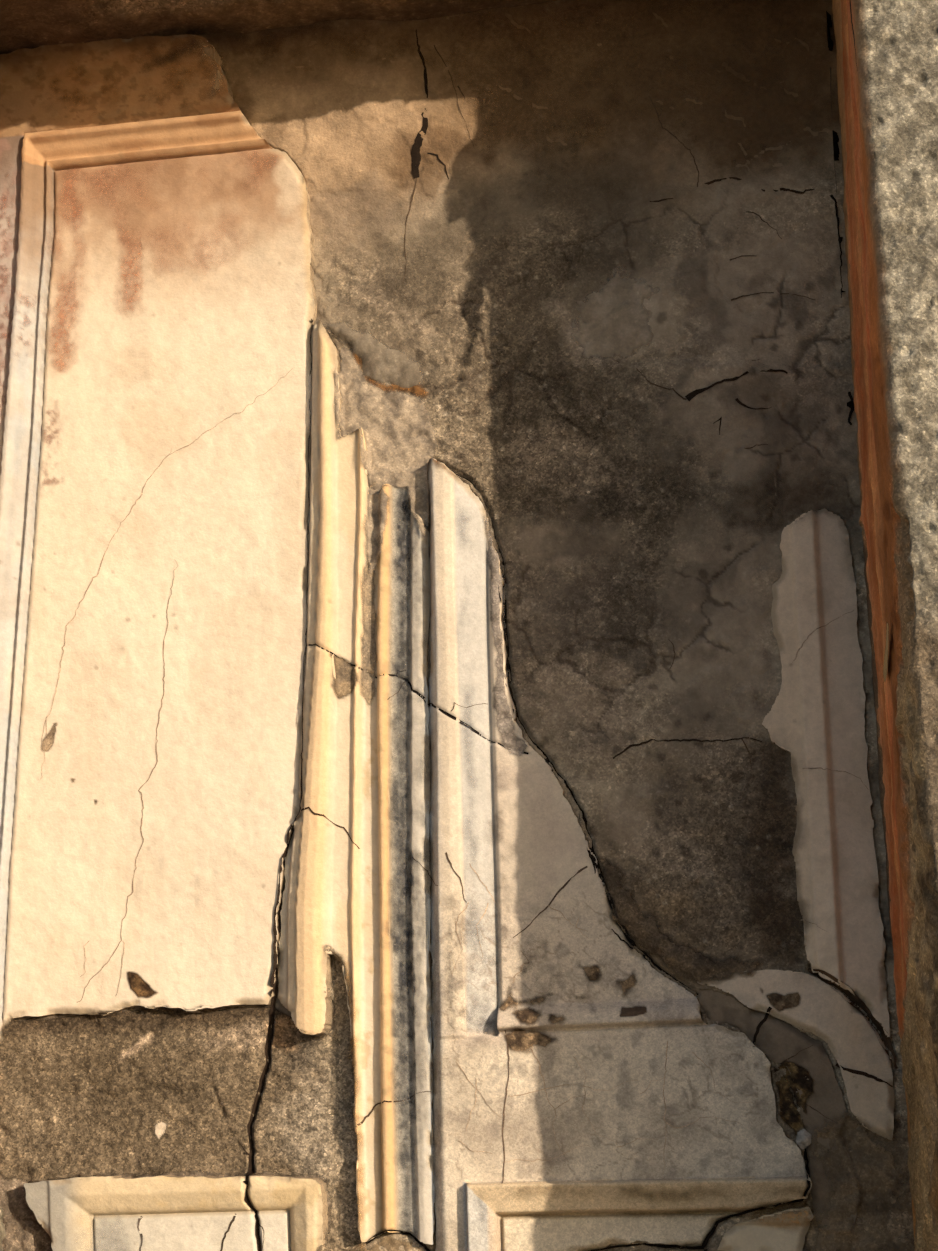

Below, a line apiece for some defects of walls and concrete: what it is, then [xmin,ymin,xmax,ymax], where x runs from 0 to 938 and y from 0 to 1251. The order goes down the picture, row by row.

crack [404,29,475,277]
crack [649,0,857,301]
crack [590,359,788,449]
spalling [330,346,437,705]
spalling [485,519,527,756]
crack [41,319,698,1251]
spalling [0,945,422,1251]
spalling [499,992,565,1052]
crack [455,1030,754,1183]
spalling [617,973,647,1017]
spalling [762,991,800,1011]
crack [808,968,898,1087]